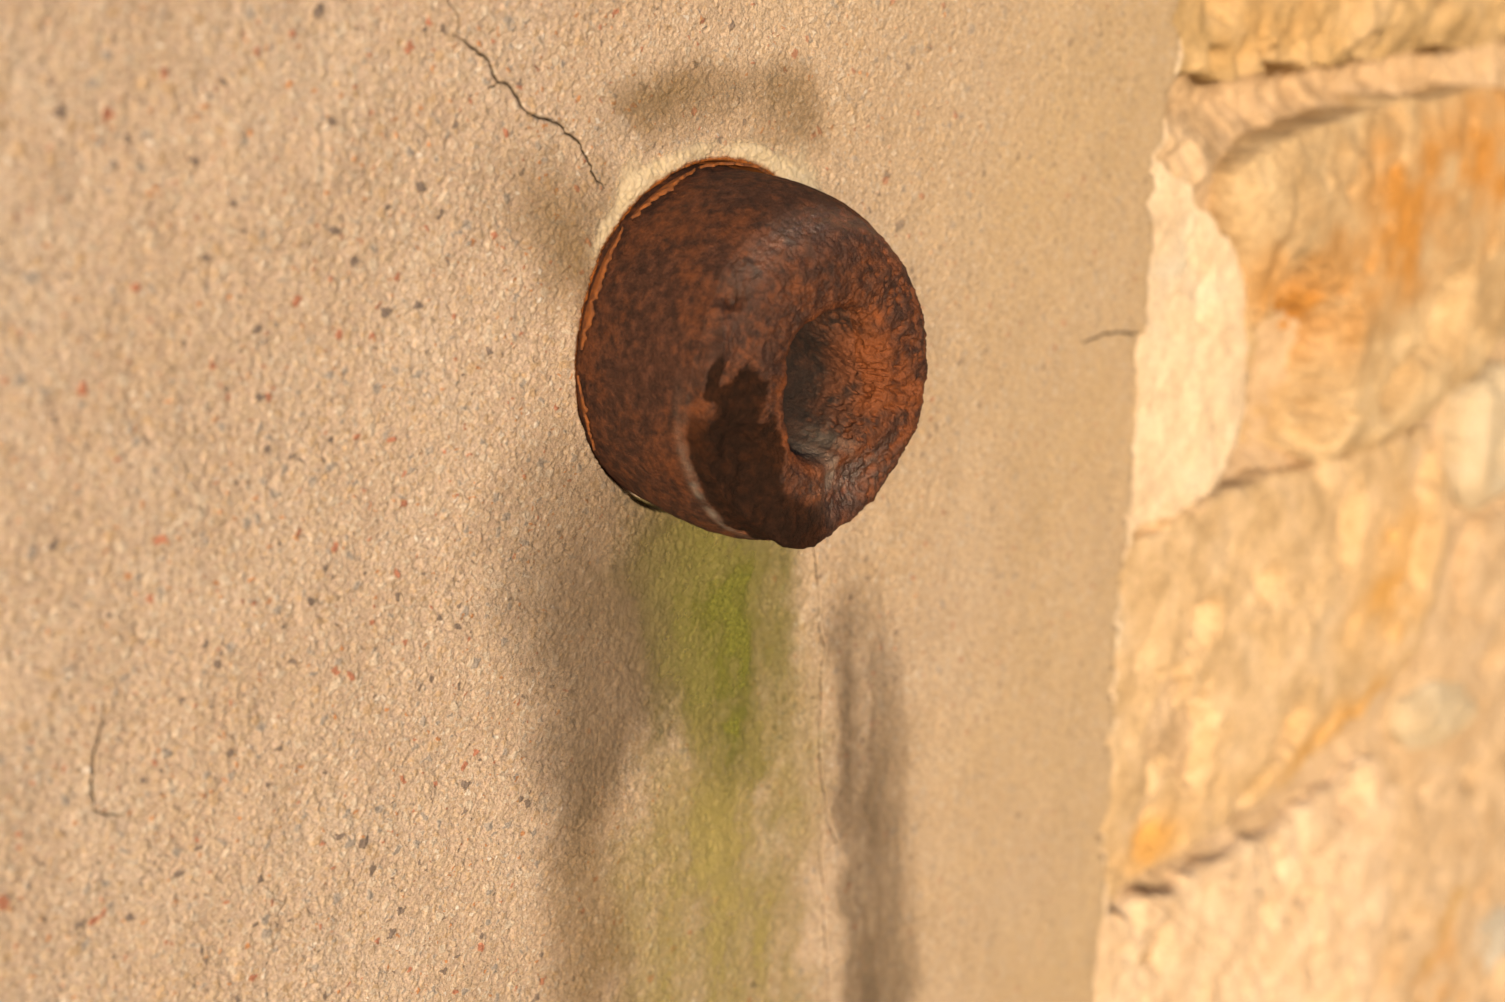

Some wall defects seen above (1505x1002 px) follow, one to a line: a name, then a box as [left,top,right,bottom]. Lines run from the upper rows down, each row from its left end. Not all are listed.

crack [447,0,605,189]
corrosion [575,156,775,451]
water stain [538,501,800,1002]